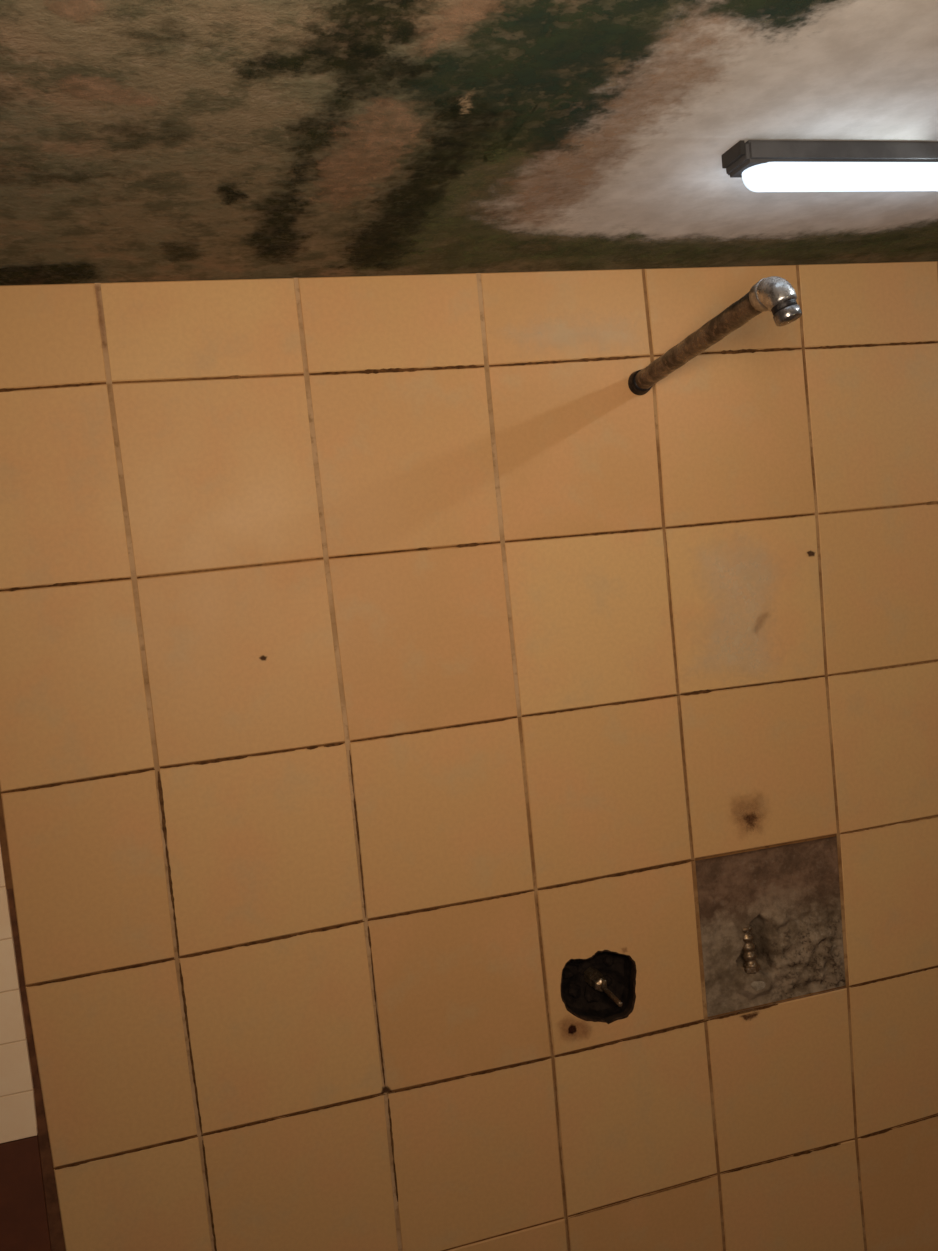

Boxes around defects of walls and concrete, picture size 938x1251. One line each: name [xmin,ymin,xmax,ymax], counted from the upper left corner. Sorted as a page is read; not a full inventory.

leakage [238,0,835,269]
leakage [218,185,248,205]
leakage [0,264,97,285]
peeling [695,835,846,1019]
spalling [560,950,637,1024]